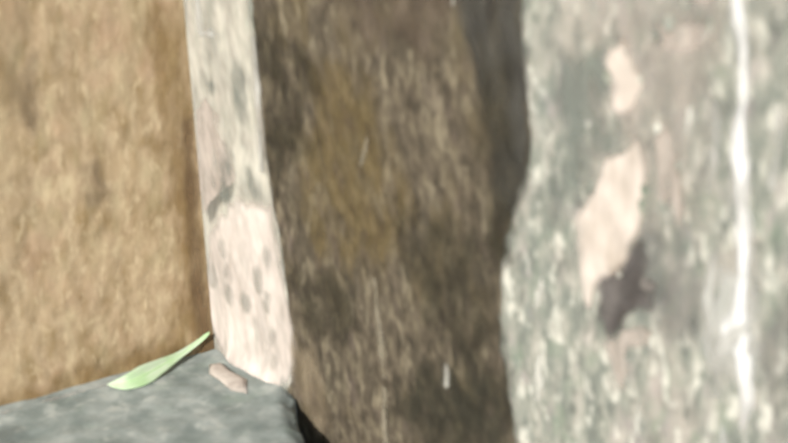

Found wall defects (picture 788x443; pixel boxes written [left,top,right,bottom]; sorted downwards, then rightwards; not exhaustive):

peeling [603,34,643,113]
peeling [652,14,716,51]
peeling [577,122,683,387]
water stain [703,0,753,426]